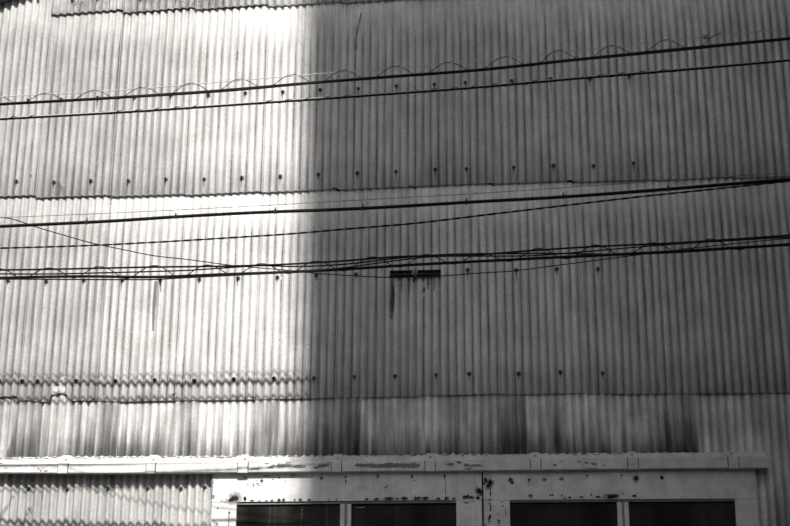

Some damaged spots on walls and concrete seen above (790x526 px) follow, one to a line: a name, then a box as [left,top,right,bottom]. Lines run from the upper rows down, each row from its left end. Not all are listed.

leakage [390,279,410,319]
peeling [348,454,422,468]
corrosion [365,475,506,526]